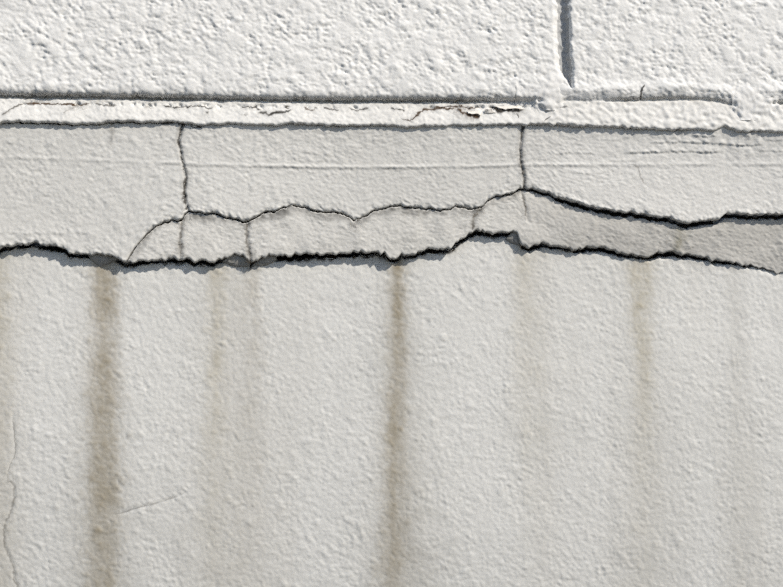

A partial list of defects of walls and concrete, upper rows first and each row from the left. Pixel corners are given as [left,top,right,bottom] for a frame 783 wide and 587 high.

crack [0,102,783,268]
peeling [126,189,783,274]
leakage [47,253,325,587]
leakage [340,253,472,587]
leakage [493,238,569,587]